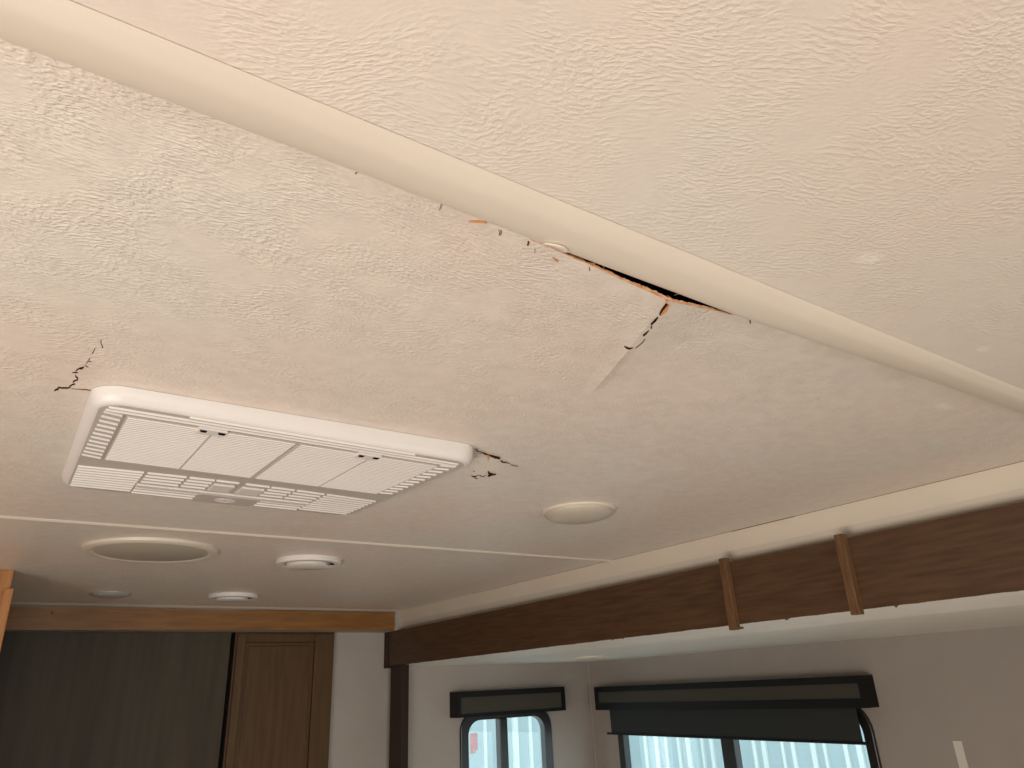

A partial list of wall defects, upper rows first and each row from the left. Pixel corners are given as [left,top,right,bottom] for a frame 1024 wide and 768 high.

crack [624,303,669,350]
crack [54,341,103,391]
crack [471,448,518,479]